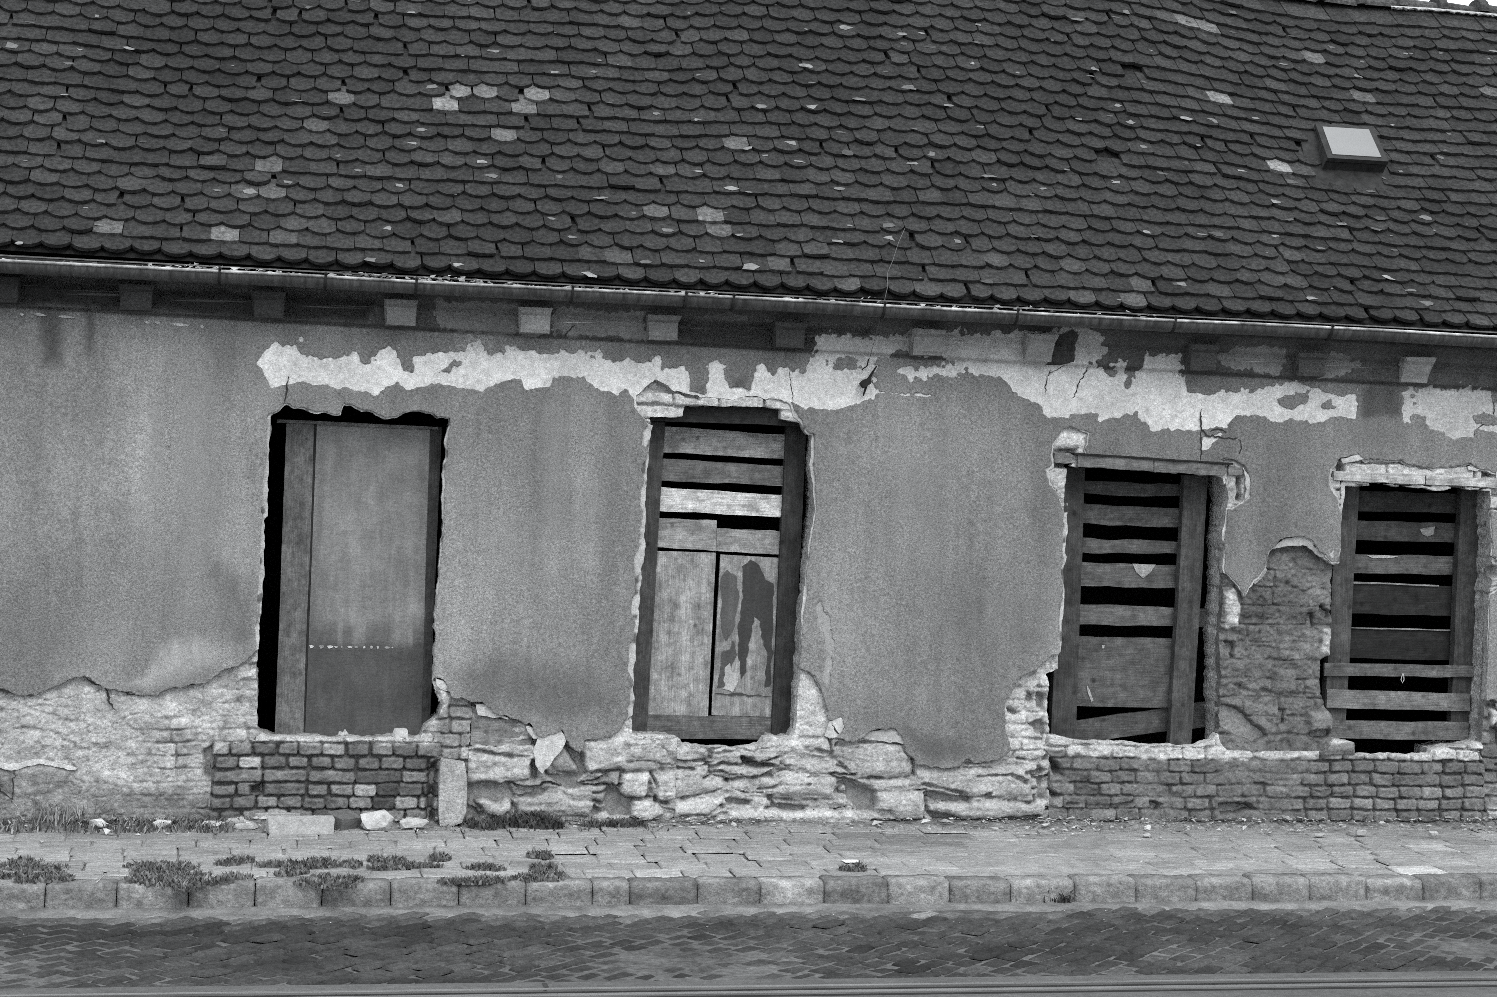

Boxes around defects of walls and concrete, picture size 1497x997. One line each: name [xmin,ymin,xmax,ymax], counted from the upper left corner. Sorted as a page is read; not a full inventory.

peeling [256,297,1371,517]
spalling [1330,454,1497,521]
peeling [1402,381,1497,440]
flaking render [0,537,1497,823]